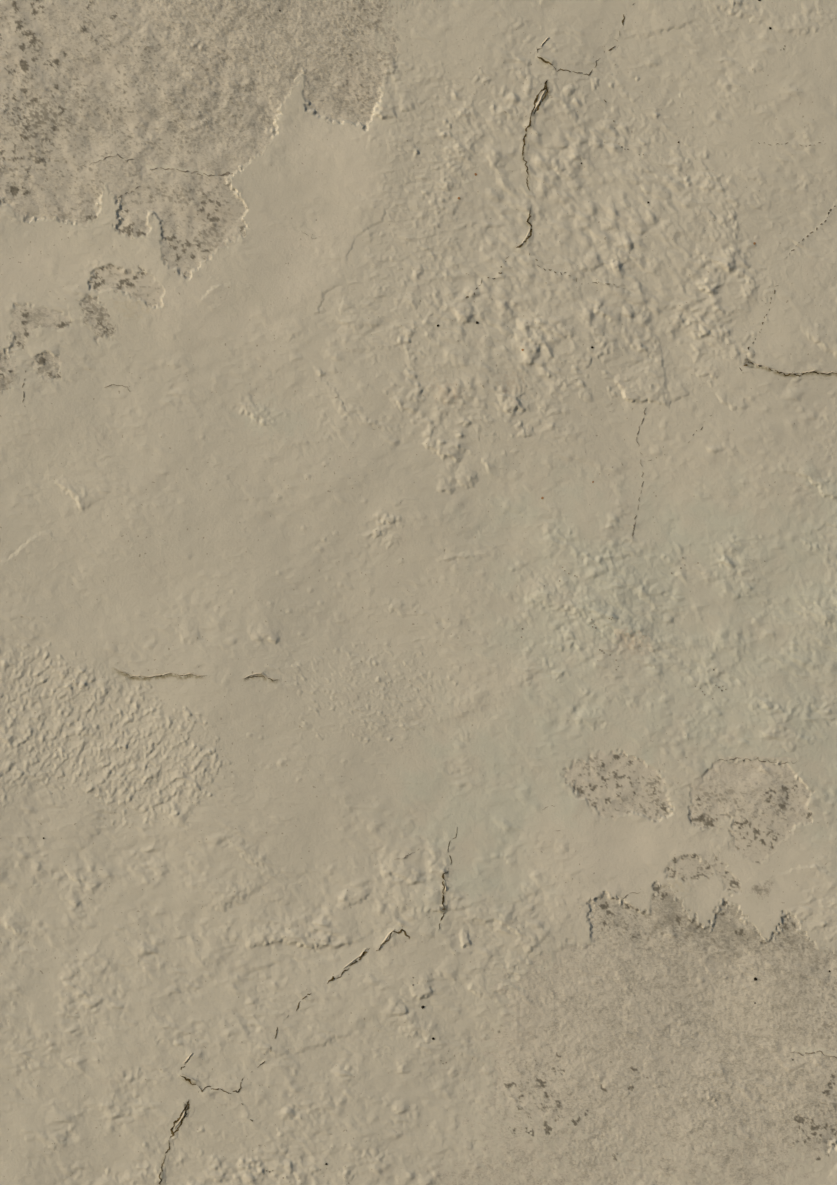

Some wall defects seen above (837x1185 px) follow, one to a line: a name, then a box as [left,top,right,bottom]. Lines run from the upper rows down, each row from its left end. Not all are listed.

peeling [0,0,426,394]
crack [466,14,625,298]
crack [786,199,837,258]
crack [736,285,837,381]
crack [107,662,209,684]
crack [239,662,282,686]
crack [155,921,410,1185]
crack [436,833,457,929]
water stain [406,995,835,1185]
peeling [465,748,837,1171]